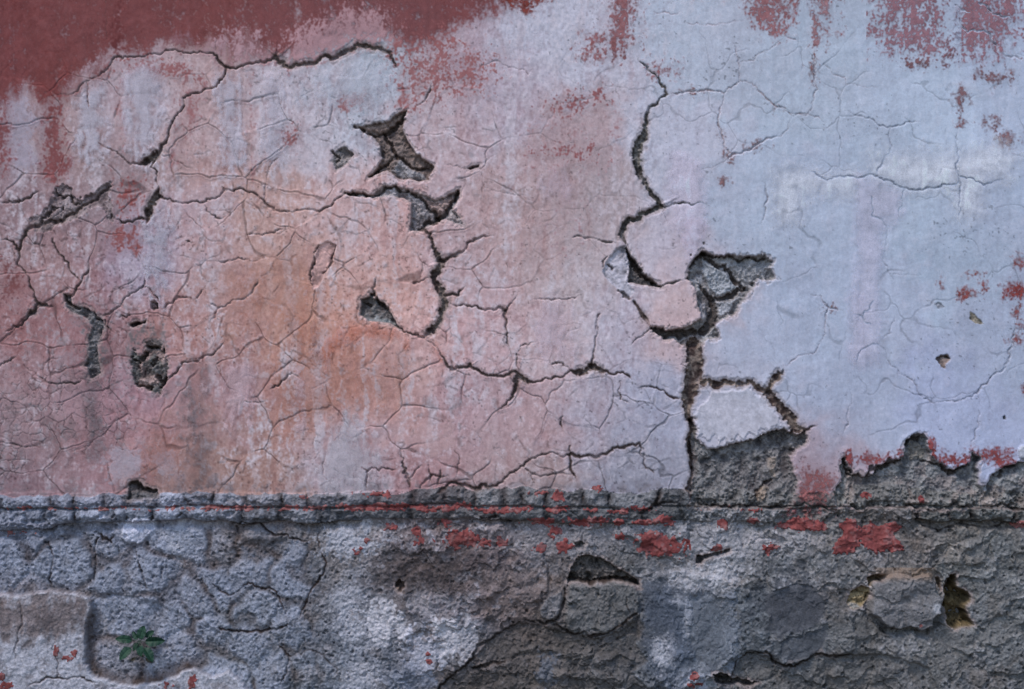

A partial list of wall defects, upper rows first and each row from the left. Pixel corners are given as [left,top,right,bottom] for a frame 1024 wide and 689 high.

peeling [866,0,1024,83]
crack [0,0,400,386]
spalling [344,110,463,232]
crack [572,10,1004,279]
peeling [602,245,663,300]
spalling [650,251,775,349]
crack [362,229,1024,532]
crack [41,494,183,591]
crack [213,457,342,689]
spalling [48,480,691,586]
spalling [686,419,1024,556]
crack [438,583,639,689]